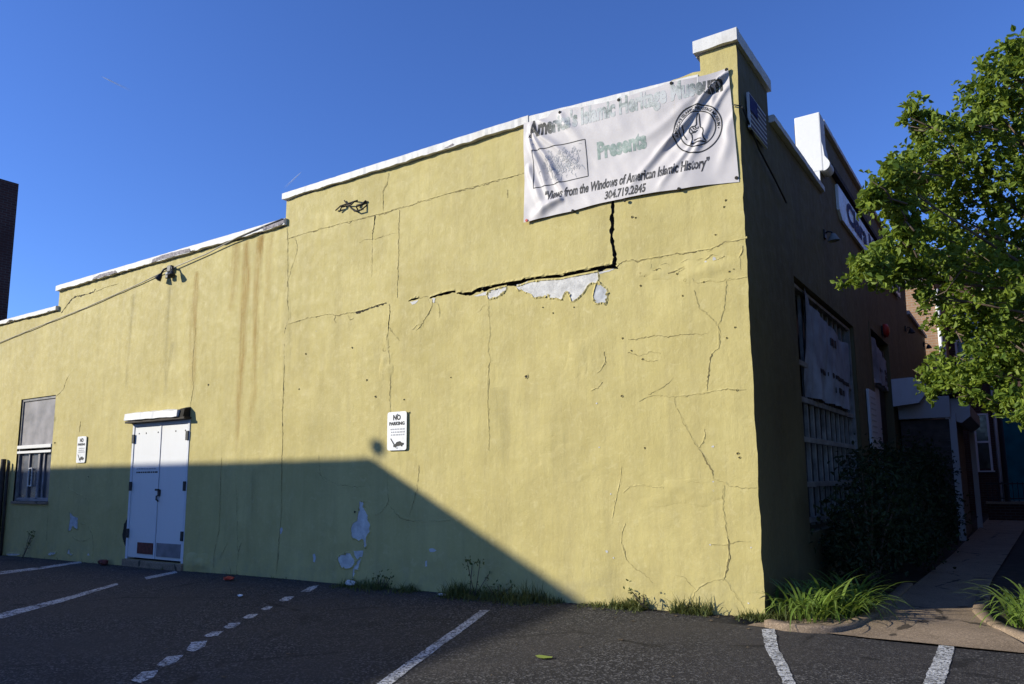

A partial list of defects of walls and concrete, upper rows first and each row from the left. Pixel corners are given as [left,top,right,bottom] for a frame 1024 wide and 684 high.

peeling [475,269,614,314]
crack [276,173,749,612]
peeling [337,500,371,581]